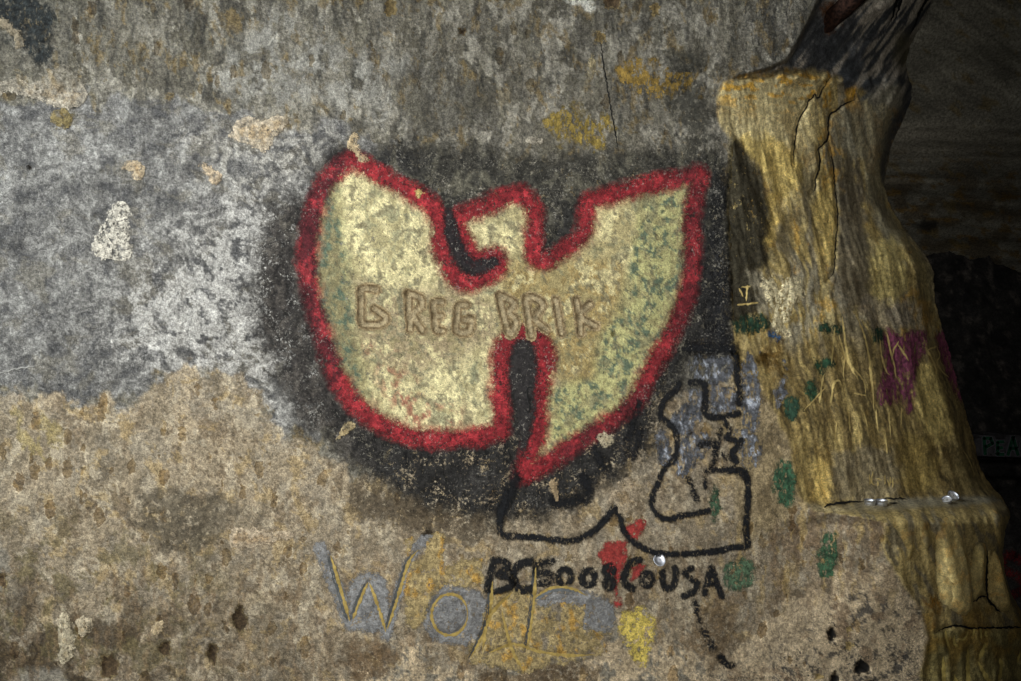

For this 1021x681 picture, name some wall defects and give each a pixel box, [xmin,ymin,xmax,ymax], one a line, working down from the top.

crack [891,0,928,35]
crack [793,78,854,279]
crack [824,497,905,508]
crack [936,551,1021,633]